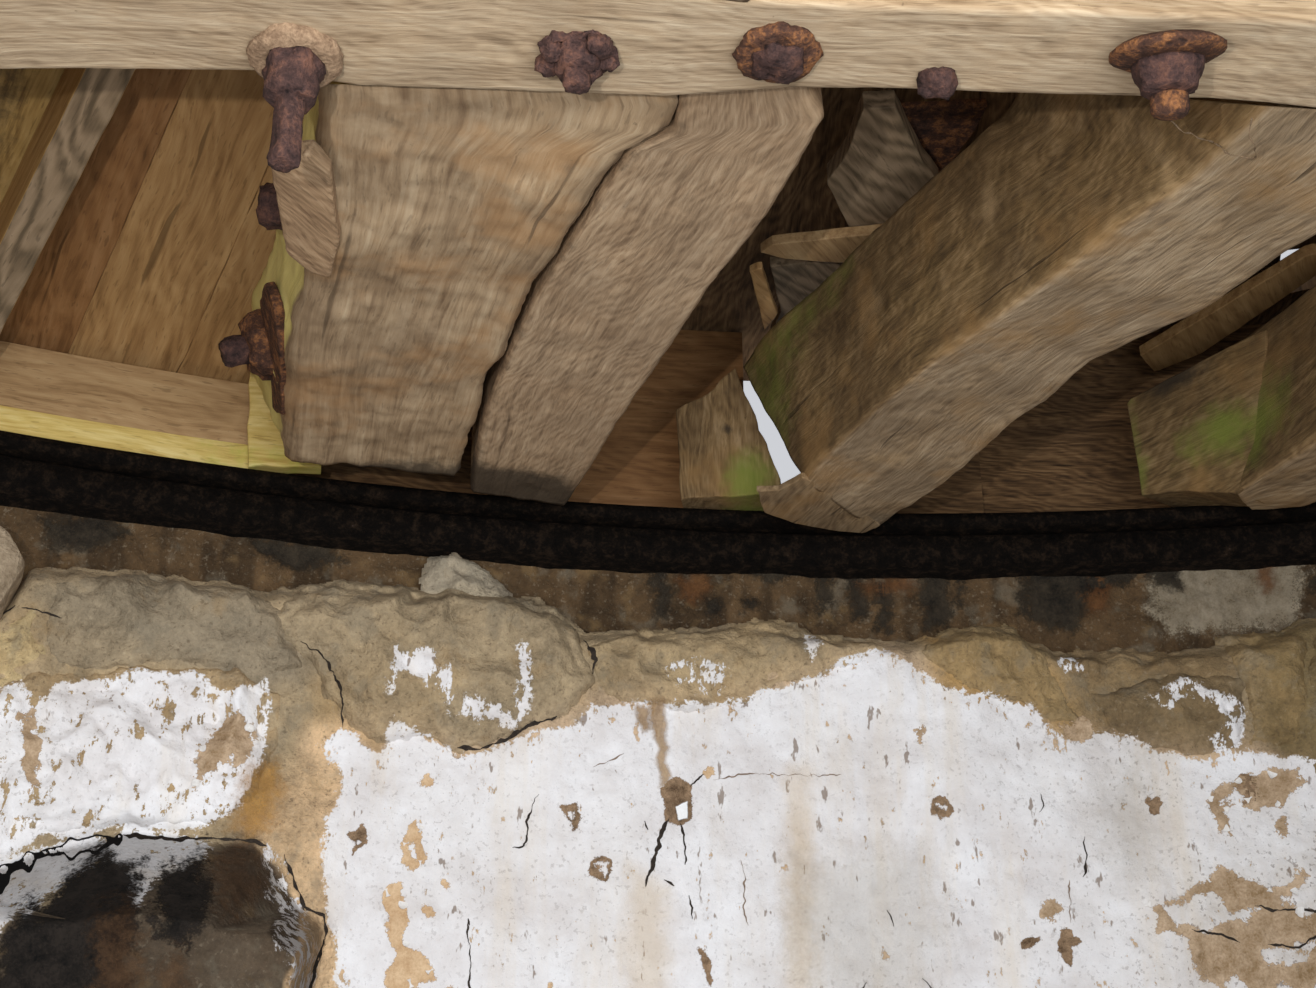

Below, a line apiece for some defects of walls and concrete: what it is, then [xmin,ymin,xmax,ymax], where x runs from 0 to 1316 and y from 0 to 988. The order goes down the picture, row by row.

water stain [248,537,349,571]
water stain [846,578,894,635]
water stain [1014,574,1130,635]
water stain [1144,566,1306,635]
crack [690,772,841,787]
spalling [1145,795,1163,815]
peeling [1206,766,1308,839]
spalling [347,824,368,856]
peeling [382,820,452,988]
crack [645,819,693,919]
crack [740,862,748,923]
peeling [1144,864,1316,988]